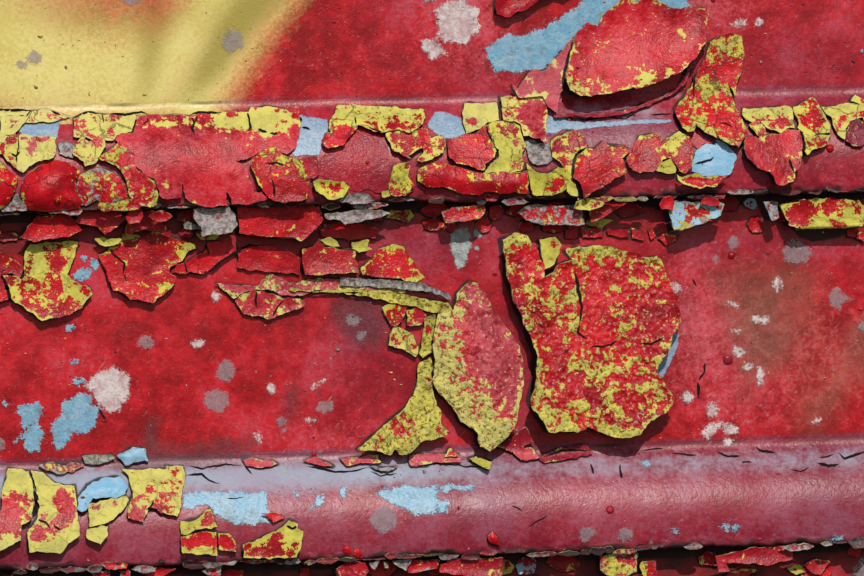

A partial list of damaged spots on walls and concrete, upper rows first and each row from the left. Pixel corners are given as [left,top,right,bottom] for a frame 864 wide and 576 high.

peeling [0,0,864,321]
peeling [2,377,100,453]
peeling [0,447,659,576]
peeling [217,244,593,463]
peeling [502,232,681,439]
peeling [683,535,864,576]